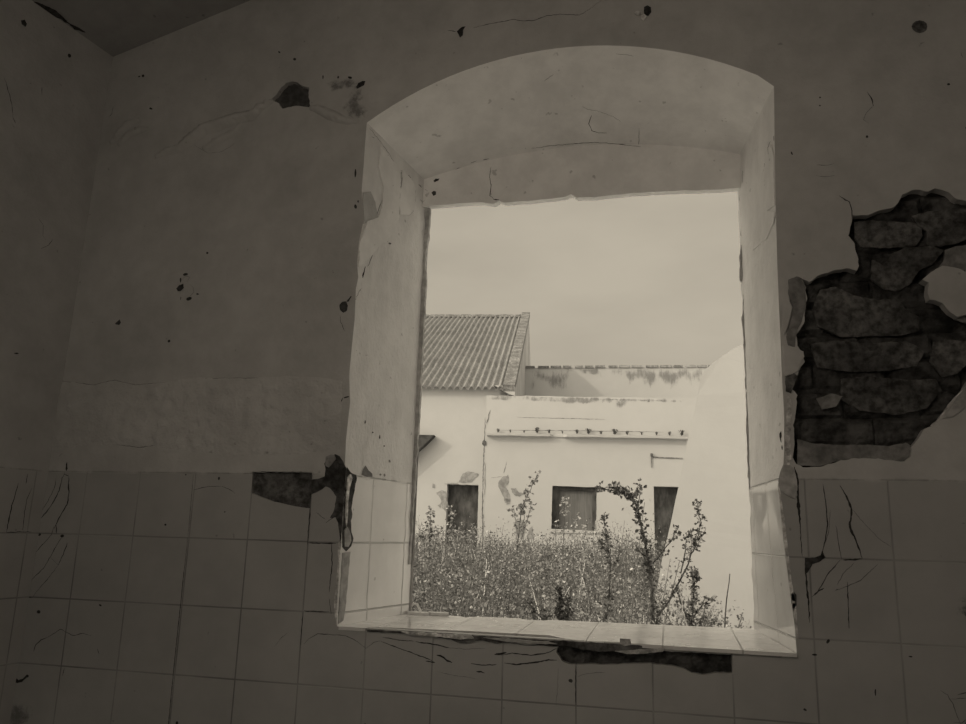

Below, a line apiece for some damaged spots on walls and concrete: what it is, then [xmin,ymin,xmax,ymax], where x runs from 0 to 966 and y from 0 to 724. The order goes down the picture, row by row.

spalling [275,84,310,109]
spalling [778,193,966,640]
spalling [253,454,385,624]
crack [277,510,557,679]
crack [794,467,891,623]